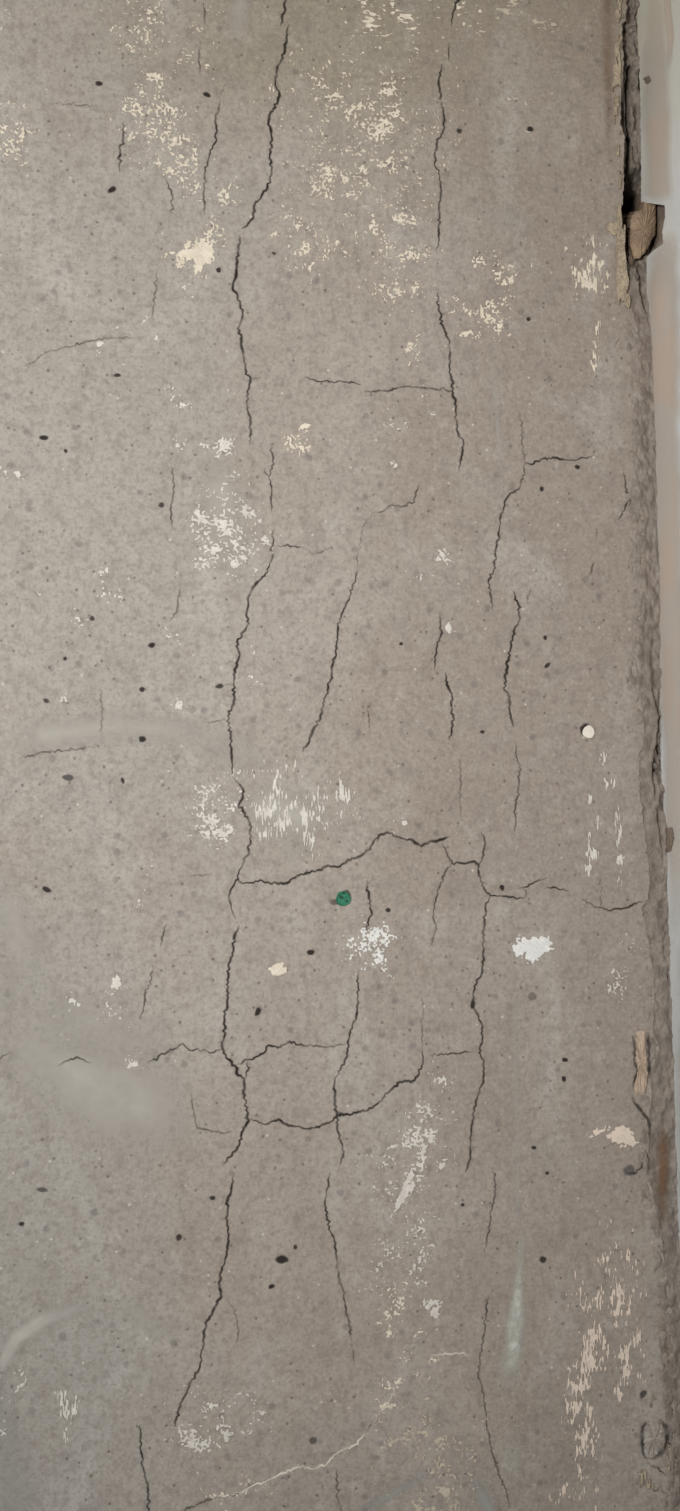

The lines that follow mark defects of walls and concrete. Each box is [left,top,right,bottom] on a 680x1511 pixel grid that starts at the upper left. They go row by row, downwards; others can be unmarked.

crack [139,0,585,1511]
spalling [562,0,639,309]